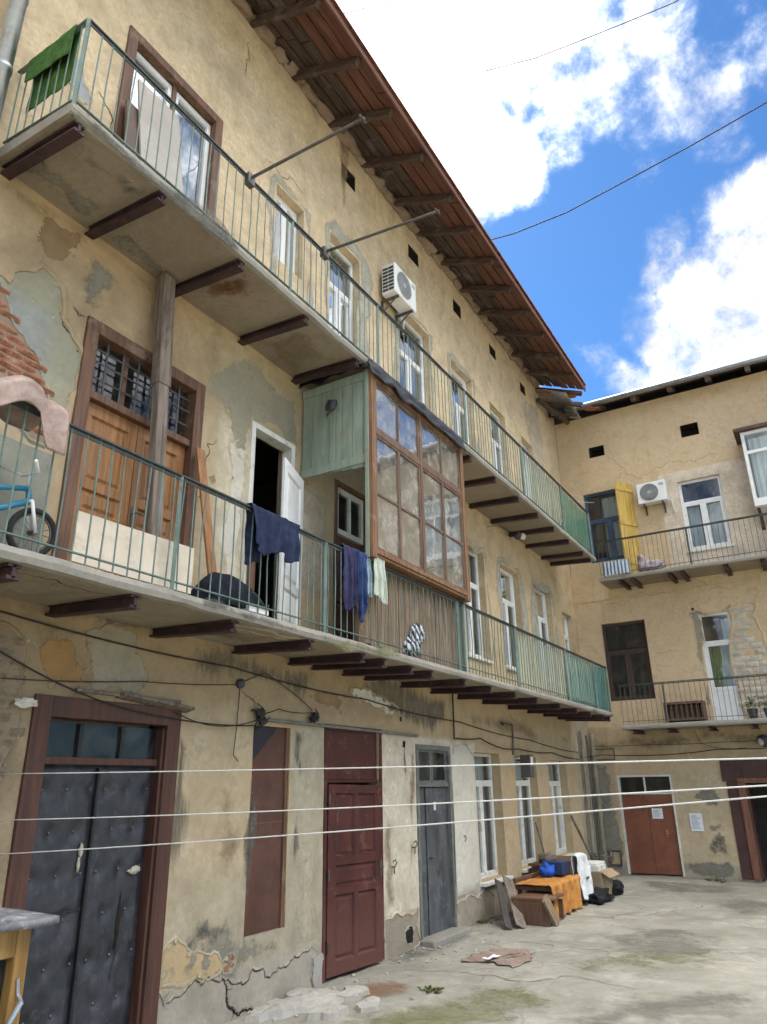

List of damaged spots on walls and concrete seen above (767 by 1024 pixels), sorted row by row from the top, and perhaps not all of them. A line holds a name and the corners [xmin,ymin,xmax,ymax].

flaking render [0,208,87,441]
flaking render [18,425,45,449]
flaking render [208,357,299,579]
flaking render [0,620,149,789]
peeling [310,686,403,723]
spalling [160,935,237,990]
crack [159,946,315,1020]